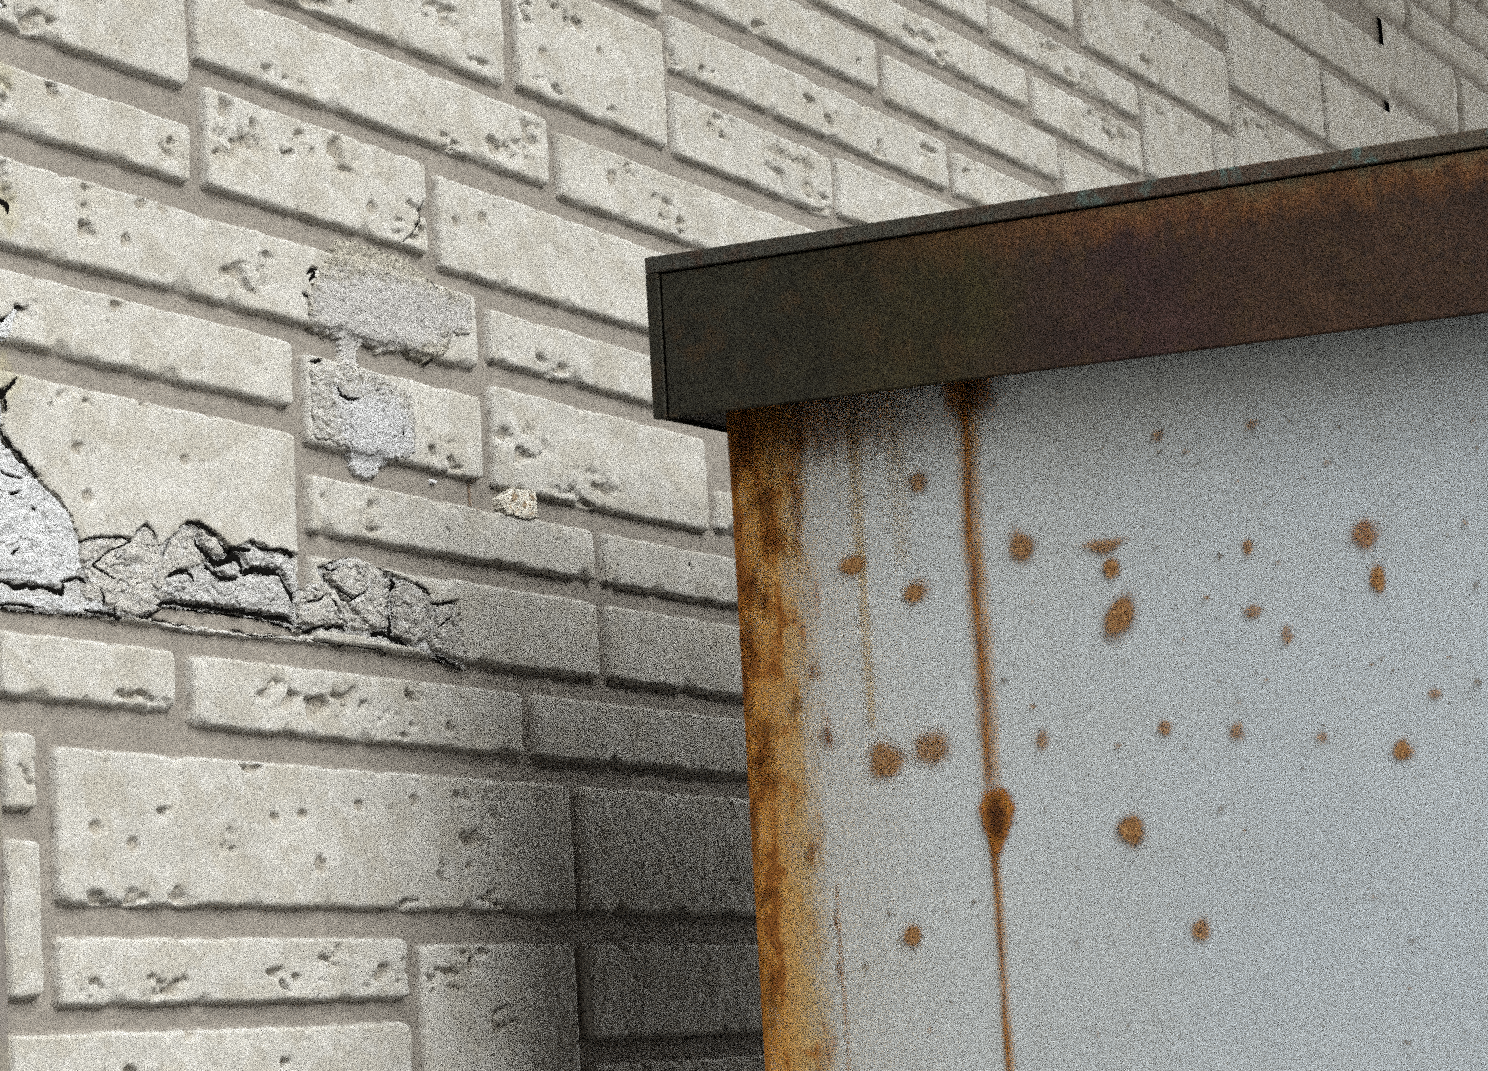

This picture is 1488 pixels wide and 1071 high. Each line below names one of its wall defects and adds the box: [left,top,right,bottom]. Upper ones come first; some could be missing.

spalling [0,403,467,670]
peeling [304,239,474,482]
rust [726,397,849,1071]
rust [941,378,1015,1071]